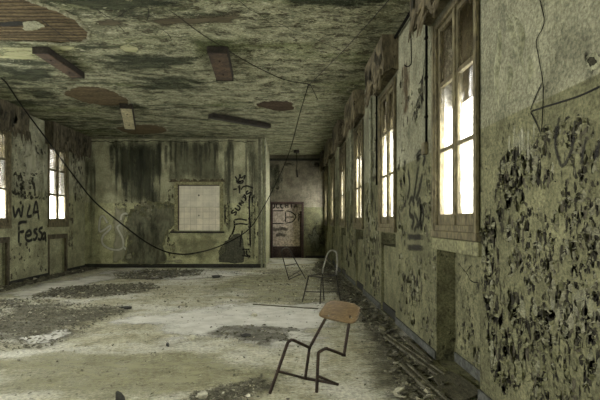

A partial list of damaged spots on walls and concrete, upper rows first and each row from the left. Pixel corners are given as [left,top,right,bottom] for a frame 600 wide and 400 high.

peeling [0,0,133,45]
damp [61,0,181,12]
damp [150,14,243,26]
damp [0,66,55,84]
damp [102,36,246,93]
damp [110,139,233,203]
peeling [397,76,425,246]
peeling [479,114,600,400]